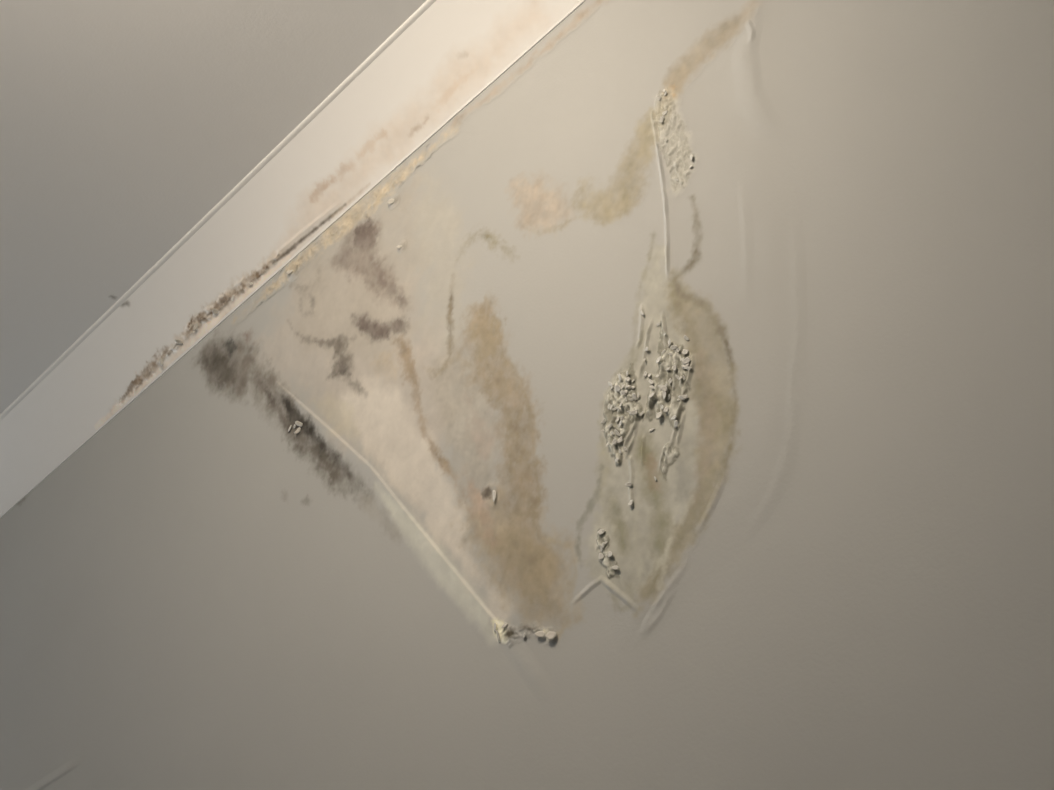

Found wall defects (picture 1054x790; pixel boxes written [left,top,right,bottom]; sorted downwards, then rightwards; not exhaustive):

peeling [647,84,700,245]
peeling [93,248,293,430]
water stain [189,0,765,651]
peeling [599,310,700,468]
peeling [581,522,626,598]